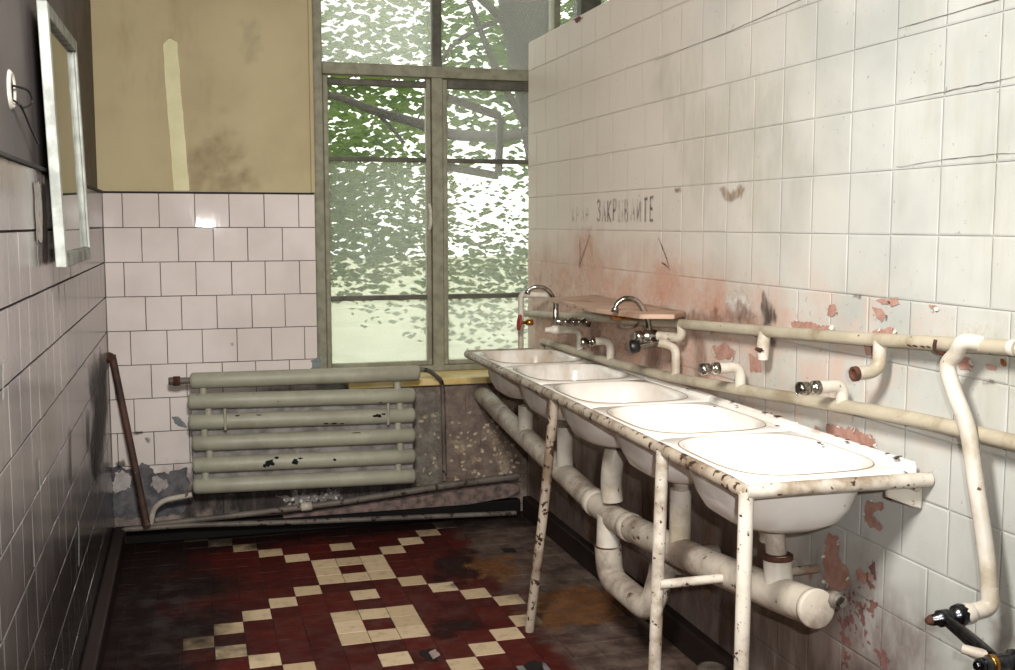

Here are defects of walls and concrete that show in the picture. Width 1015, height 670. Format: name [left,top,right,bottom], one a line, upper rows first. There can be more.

crack [901,76,1015,101]
crack [896,153,1014,167]
peeling [790,304,837,330]
peeling [872,297,899,334]
peeling [712,343,735,361]
peeling [748,347,764,372]
peeling [814,424,878,449]
spalling [112,462,190,520]
peeling [862,497,891,532]
peeling [808,532,872,592]